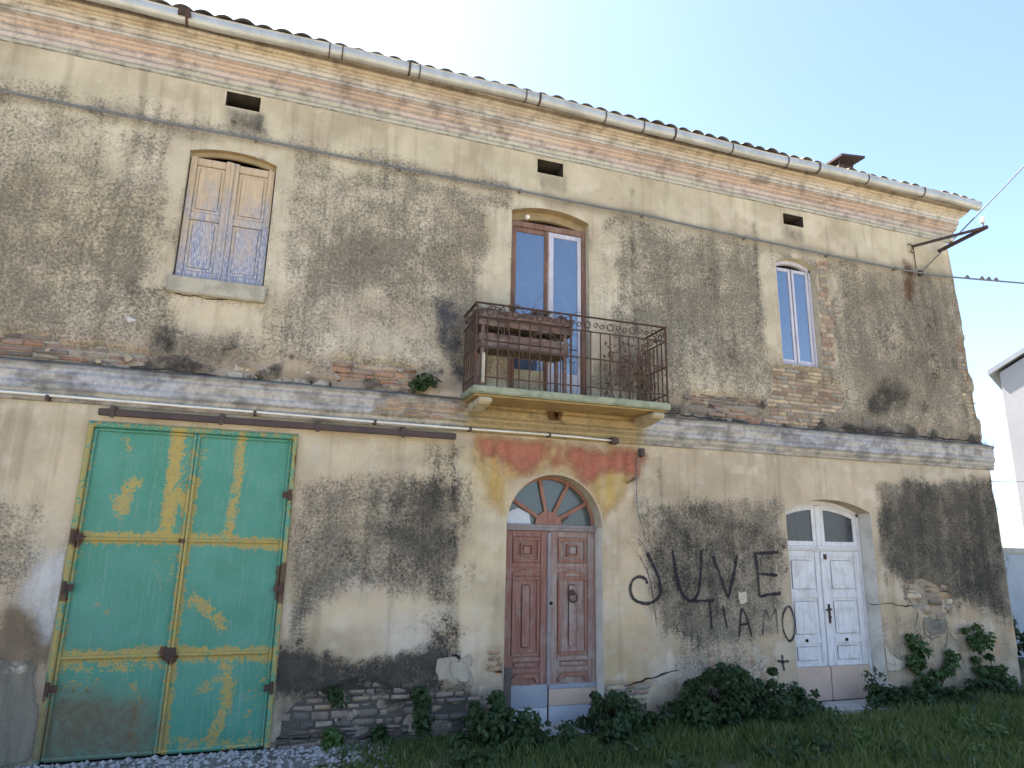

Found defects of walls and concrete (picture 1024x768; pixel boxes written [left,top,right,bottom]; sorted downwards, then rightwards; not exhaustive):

leakage [121,328,213,373]
spalling [680,262,859,429]
spalling [227,361,469,421]
leakage [845,384,938,440]
peeling [475,436,643,508]
leakage [380,449,471,605]
leakage [640,497,787,628]
leakage [878,476,1015,625]
crack [868,597,958,653]
spalling [902,578,952,636]
leakage [276,619,458,707]
spalling [260,681,489,750]